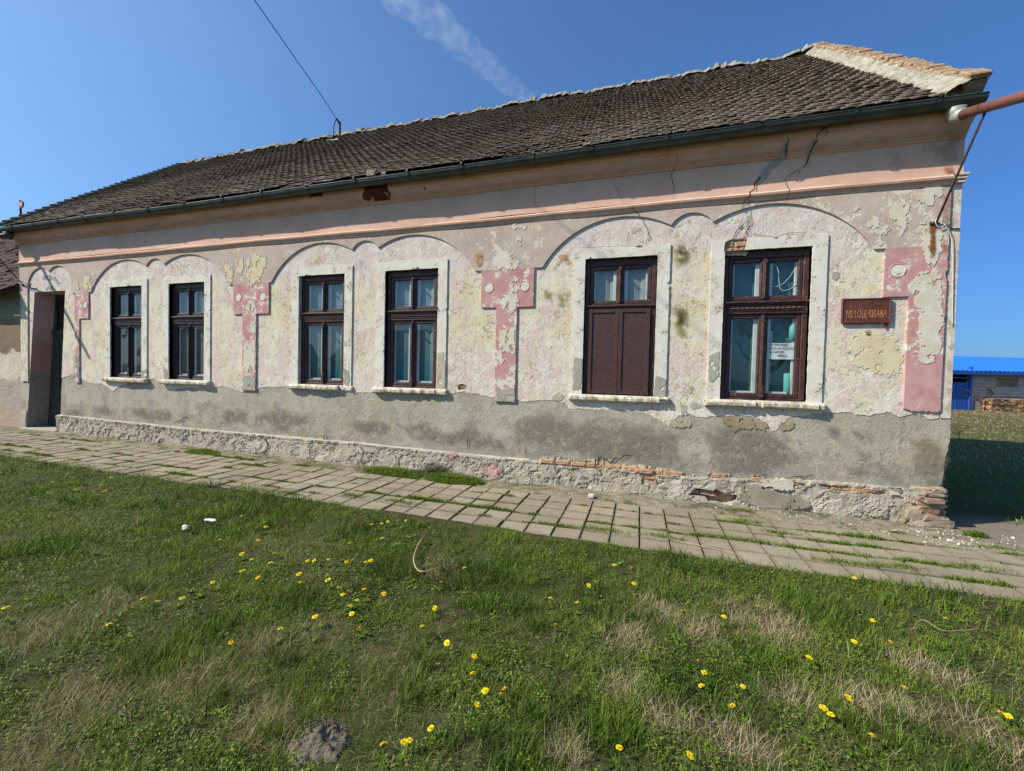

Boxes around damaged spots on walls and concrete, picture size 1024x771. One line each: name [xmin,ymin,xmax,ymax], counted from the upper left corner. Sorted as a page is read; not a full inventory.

crack [732,125,832,240]
corrosion [929,197,949,257]
peeling [223,253,267,393]
peeling [493,223,527,364]
peeling [846,182,945,378]
peeling [495,385,516,402]
flaking render [722,415,794,433]
spalling [539,456,736,501]
spalling [819,484,955,529]